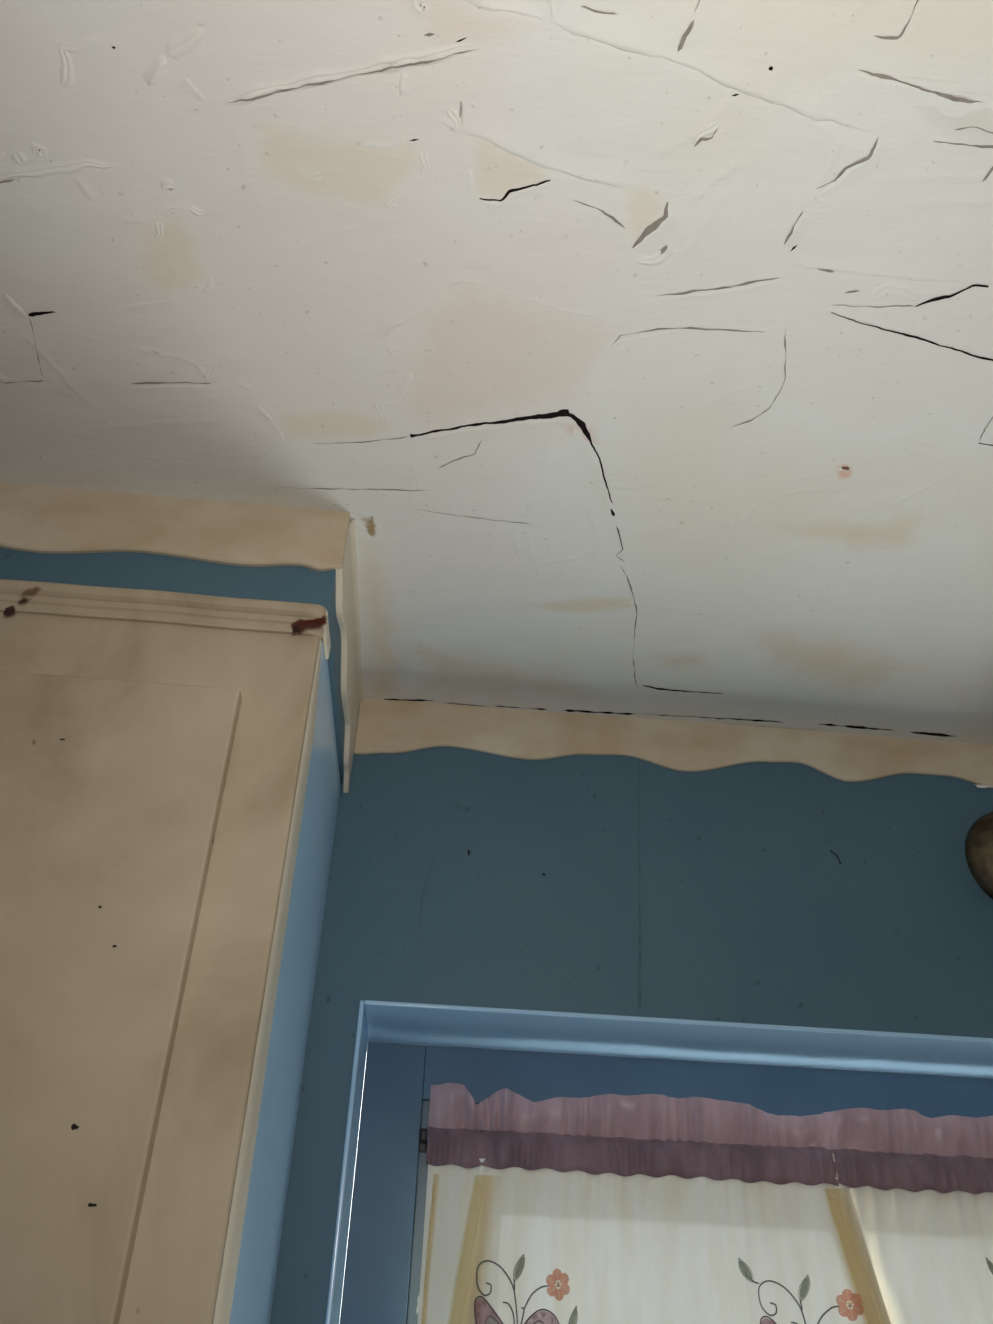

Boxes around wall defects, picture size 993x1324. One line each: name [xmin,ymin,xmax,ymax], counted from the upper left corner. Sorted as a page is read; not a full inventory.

crack [230,49,478,103]
crack [614,251,993,432]
crack [306,409,784,723]
rust [3,588,39,616]
rust [291,616,327,633]
crack [819,724,957,737]